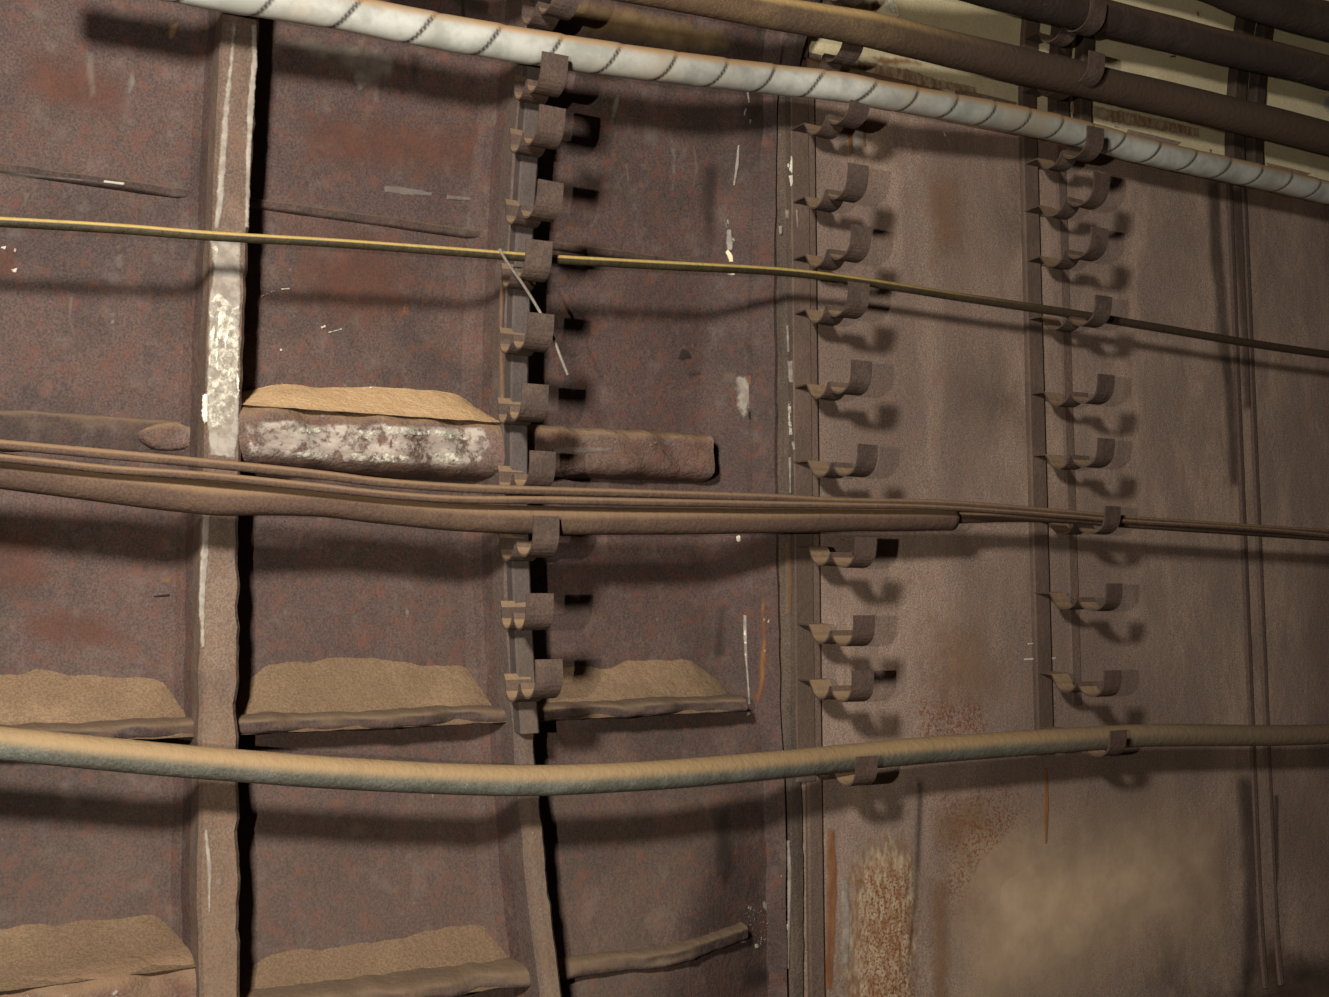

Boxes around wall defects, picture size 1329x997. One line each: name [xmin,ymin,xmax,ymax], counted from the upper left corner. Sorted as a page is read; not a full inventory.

leakage [201,24,489,468]
corrosion [825,831,836,997]